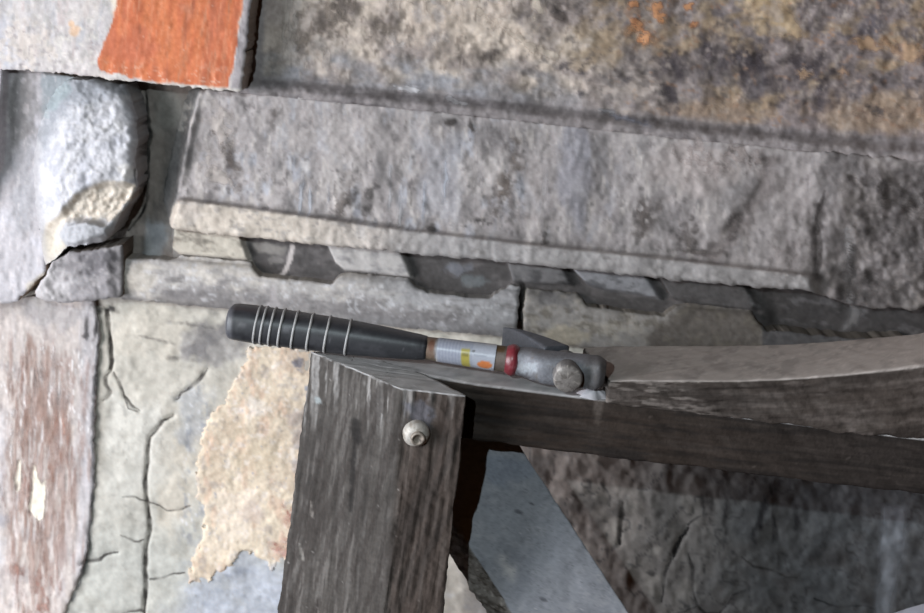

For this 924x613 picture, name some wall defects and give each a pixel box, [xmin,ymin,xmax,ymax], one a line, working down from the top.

crack [93,309,135,410]
crack [79,368,208,613]
flaking render [188,346,315,584]
crack [661,520,735,613]